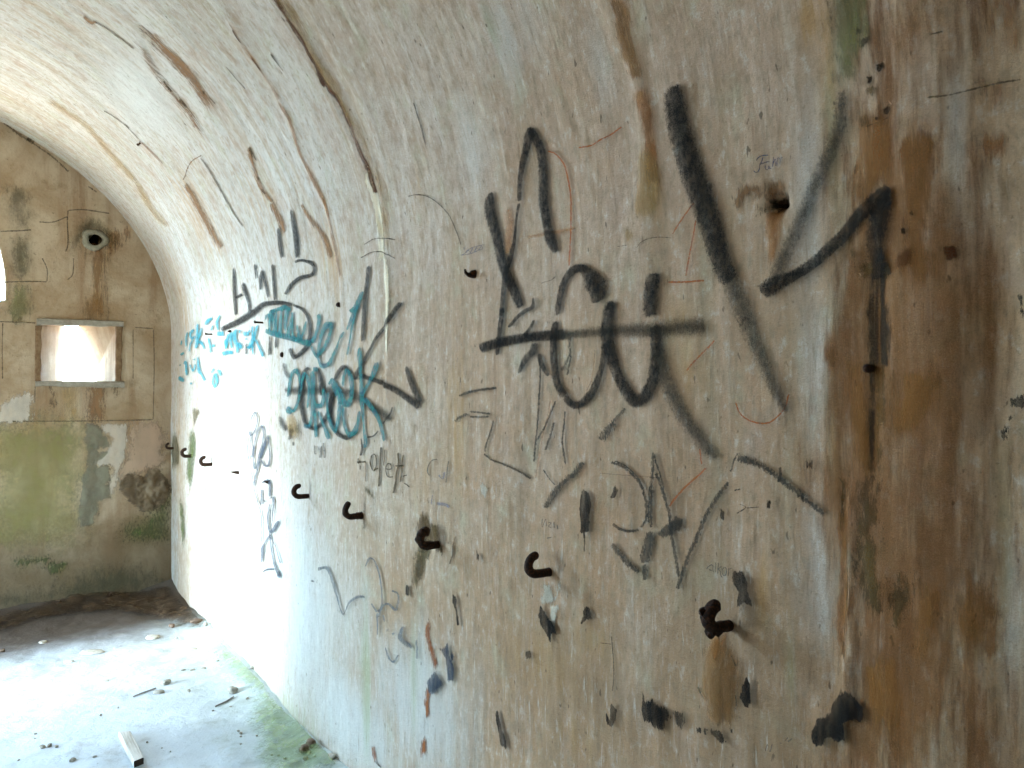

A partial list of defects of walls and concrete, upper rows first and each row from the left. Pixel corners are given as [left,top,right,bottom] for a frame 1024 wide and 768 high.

corrosion [612,0,642,79]
corrosion [636,92,659,214]
corrosion [735,184,760,209]
peeling [0,391,35,423]
water stain [77,423,110,527]
peeling [97,422,172,512]
corrosion [698,607,741,724]